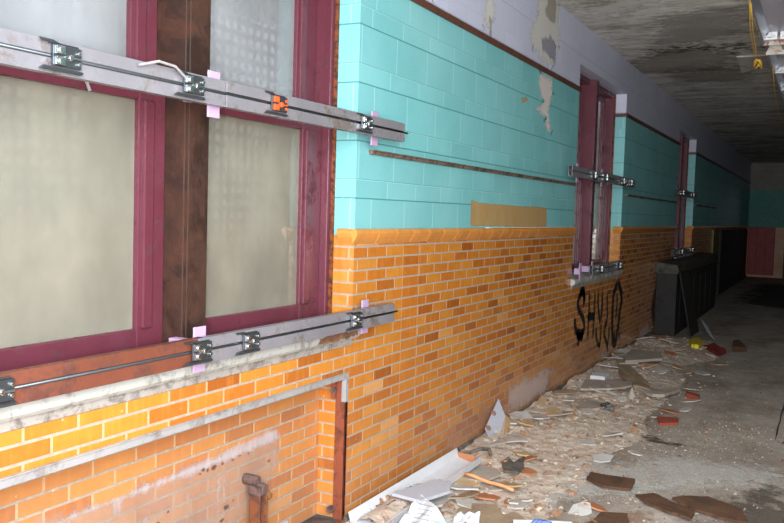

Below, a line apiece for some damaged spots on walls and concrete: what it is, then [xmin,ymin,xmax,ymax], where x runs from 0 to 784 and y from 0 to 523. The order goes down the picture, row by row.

peeling [529,0,561,135]
leakage [629,42,769,82]
leakage [135,430,277,493]